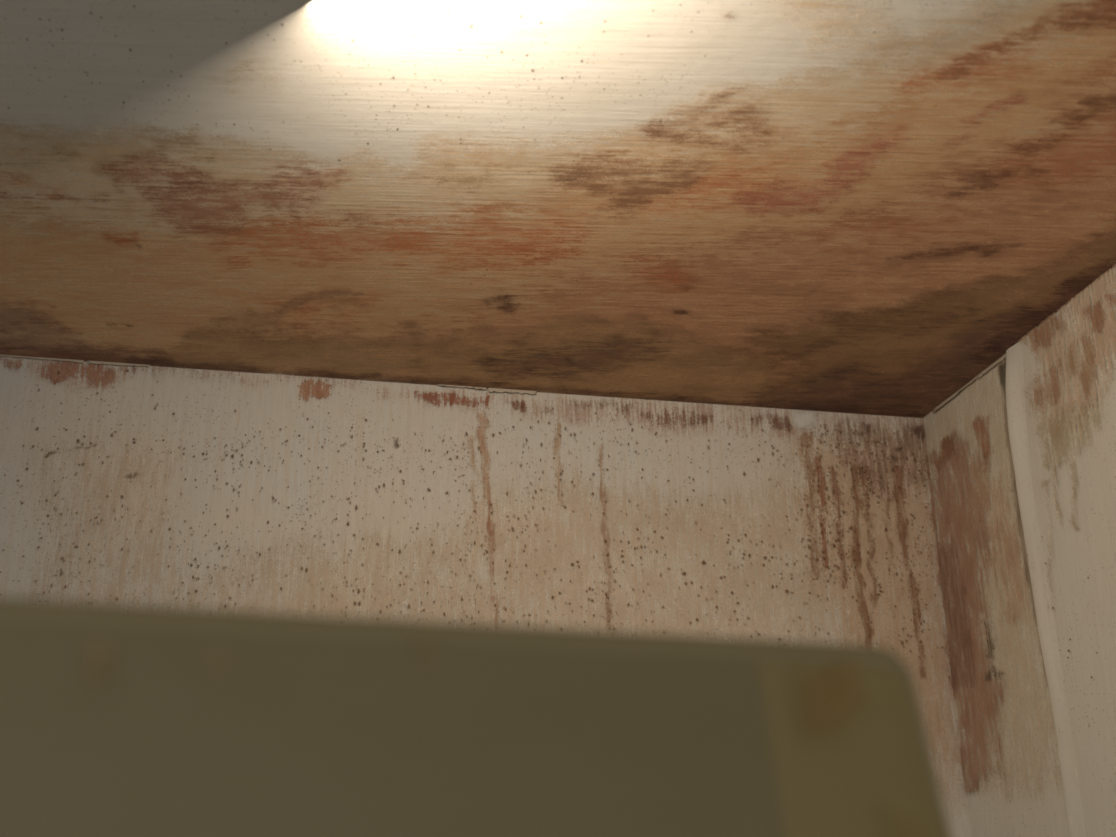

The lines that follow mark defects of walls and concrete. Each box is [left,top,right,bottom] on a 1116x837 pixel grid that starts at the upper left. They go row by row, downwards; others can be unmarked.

rust [37,361,135,388]
rust [414,391,489,407]
damp [170,431,327,517]
damp [338,424,442,508]
damp [34,438,200,605]